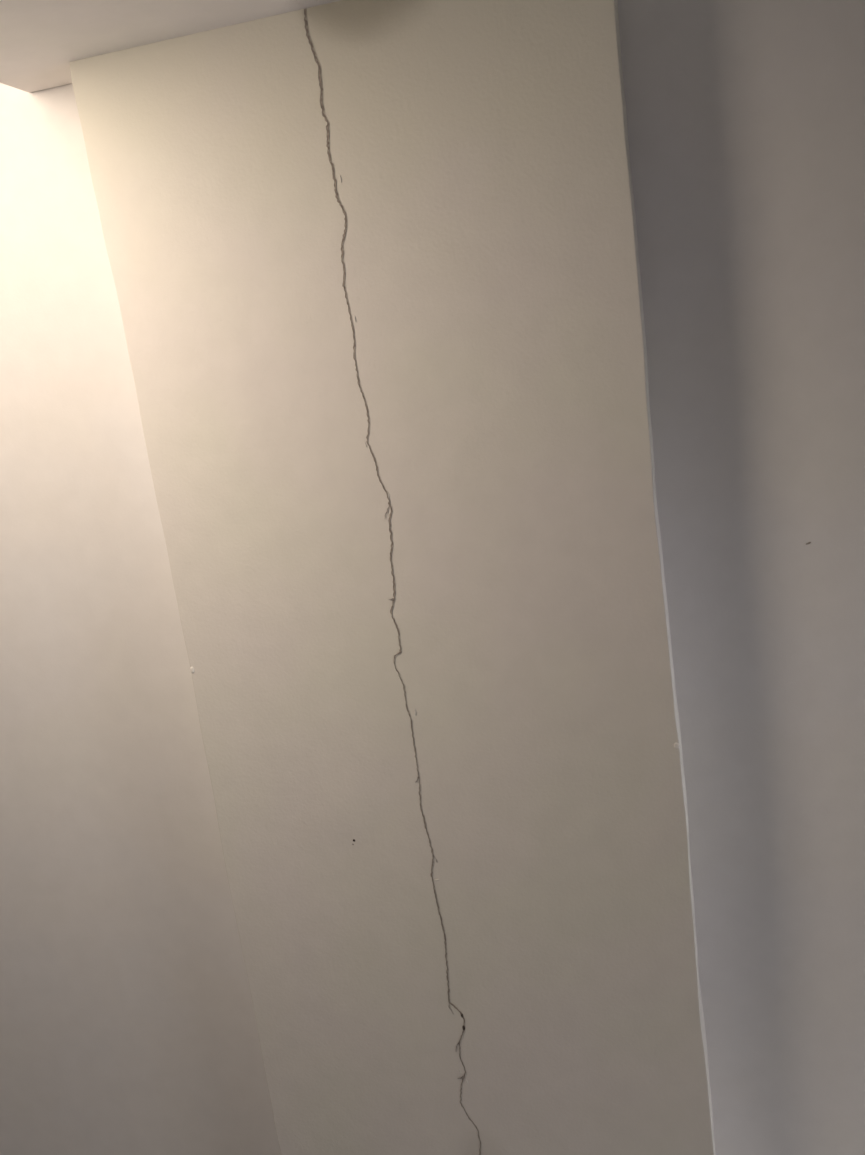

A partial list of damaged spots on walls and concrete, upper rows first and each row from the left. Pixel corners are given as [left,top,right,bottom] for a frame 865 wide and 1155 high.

crack [304,9,481,1155]